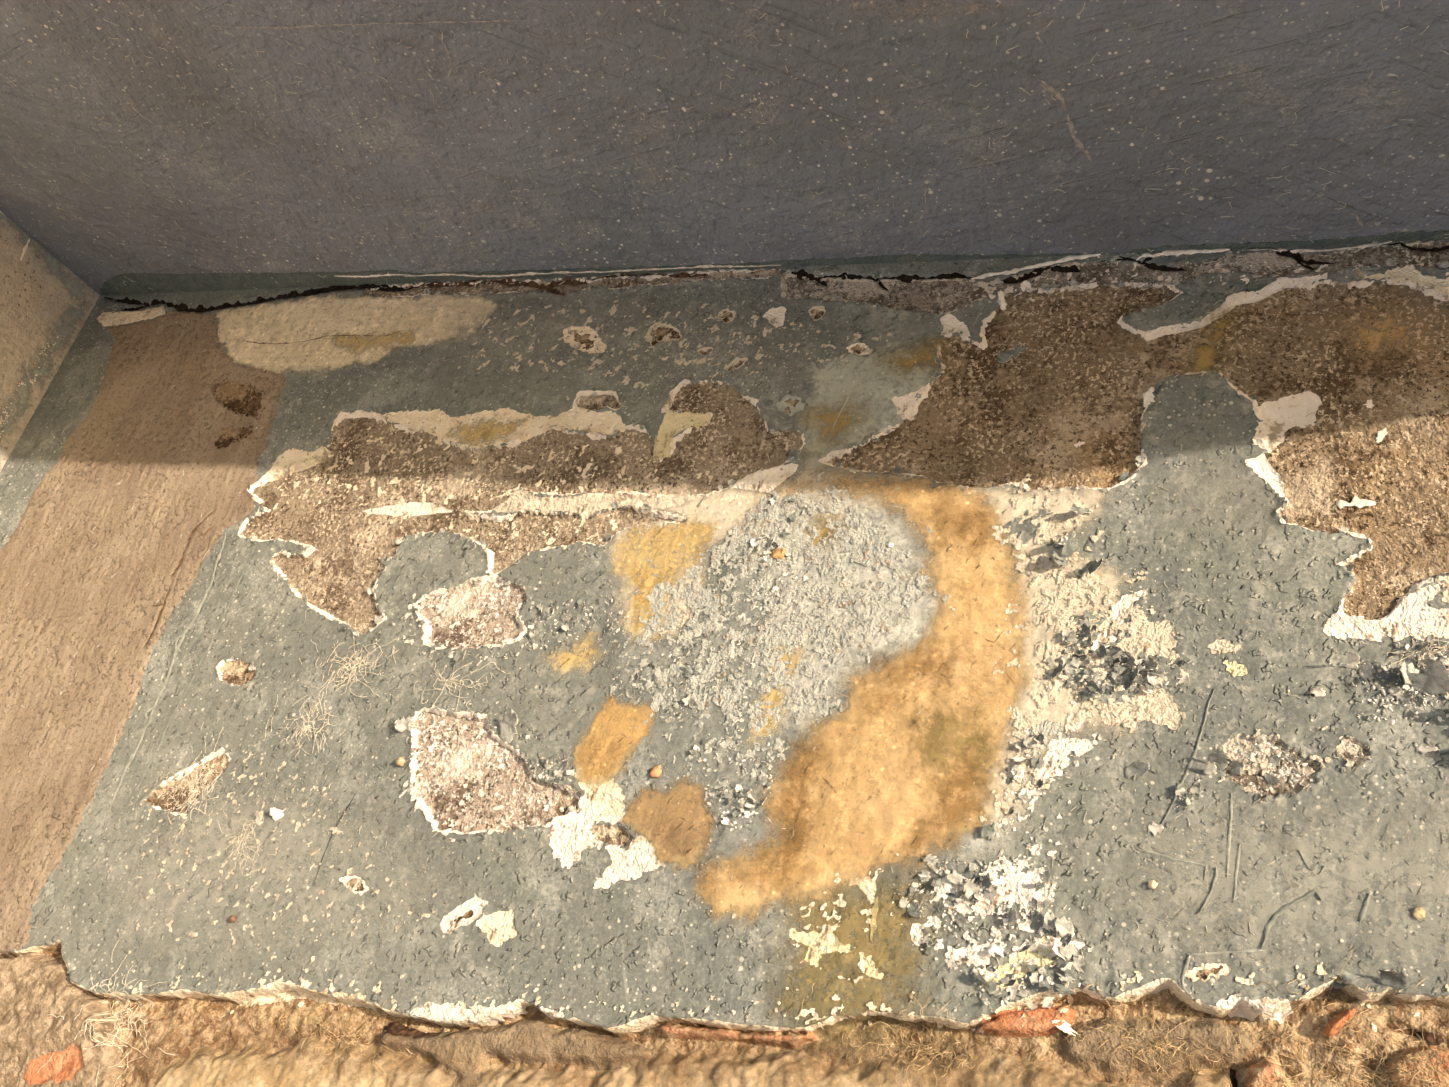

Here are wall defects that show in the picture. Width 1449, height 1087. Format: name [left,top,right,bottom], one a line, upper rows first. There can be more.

crack [104,272,708,344]
crack [782,256,1189,290]
crack [1245,248,1337,270]
crack [1388,242,1449,252]
spalling [211,241,1449,725]
peeling [981,589,1190,841]
spalling [394,706,666,889]
spalling [1175,729,1321,813]
spalling [1336,736,1369,771]
peeling [847,876,876,903]
peeling [897,854,1085,1036]